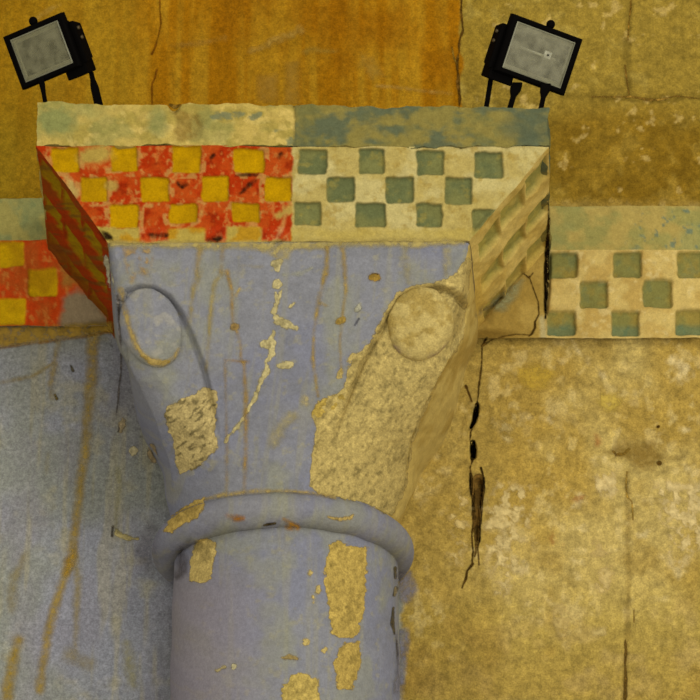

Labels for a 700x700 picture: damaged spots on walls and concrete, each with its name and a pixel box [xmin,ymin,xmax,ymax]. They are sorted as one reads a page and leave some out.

peeling [163,257,473,533]
crack [461,203,550,588]
peeling [189,539,217,583]
peeling [281,673,320,700]
peeling [312,540,368,690]